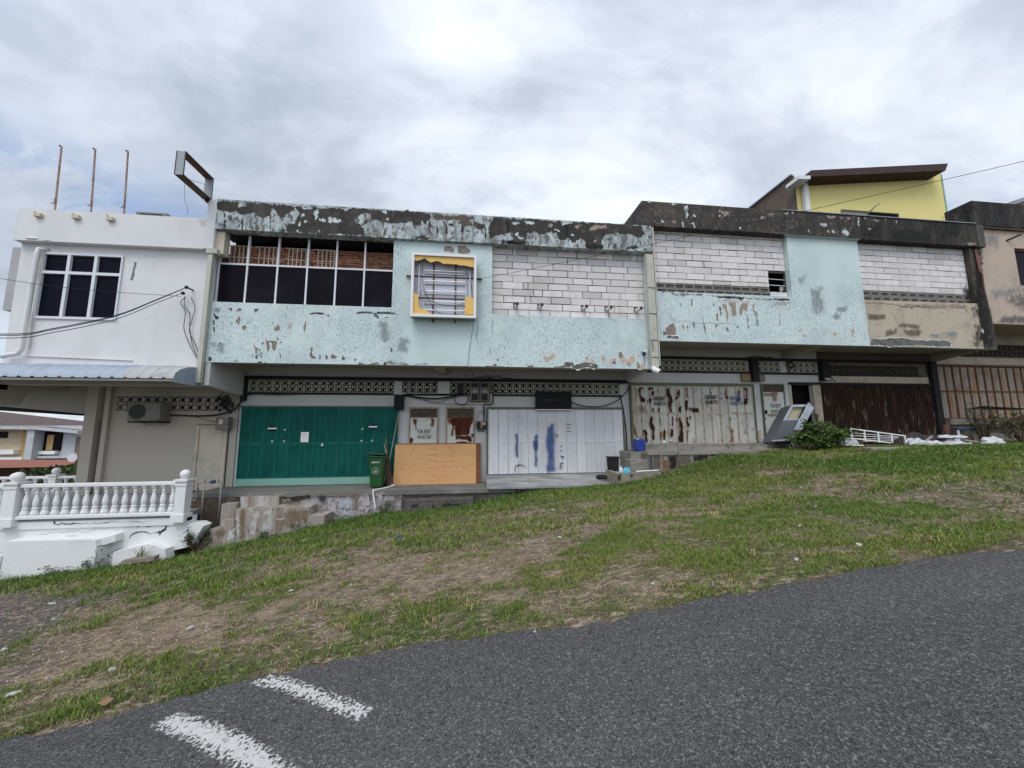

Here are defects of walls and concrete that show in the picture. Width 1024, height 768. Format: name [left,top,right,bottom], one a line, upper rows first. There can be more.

peeling [217,200,649,255]
peeling [808,216,897,236]
spalling [213,307,260,349]
spalling [253,311,329,359]
peeling [308,347,357,361]
spalling [528,351,646,371]
peeling [663,298,758,340]
leakage [886,324,956,337]
corrosion [633,387,699,442]
crack [34,521,167,559]